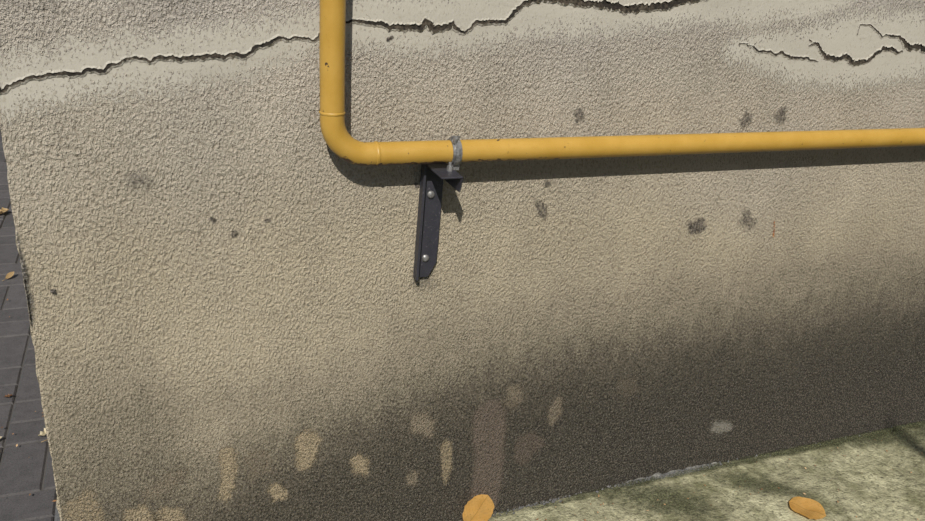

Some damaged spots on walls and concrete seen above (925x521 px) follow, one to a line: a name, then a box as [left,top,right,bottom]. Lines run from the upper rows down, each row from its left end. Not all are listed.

crack [346,0,708,35]
crack [0,31,319,95]
crack [739,23,925,67]
damp [101,281,925,521]
peeling [410,412,435,438]
peeling [218,447,239,501]
peeling [294,428,322,471]
peeling [441,441,453,484]
peeling [62,489,104,521]
peeling [122,504,187,521]